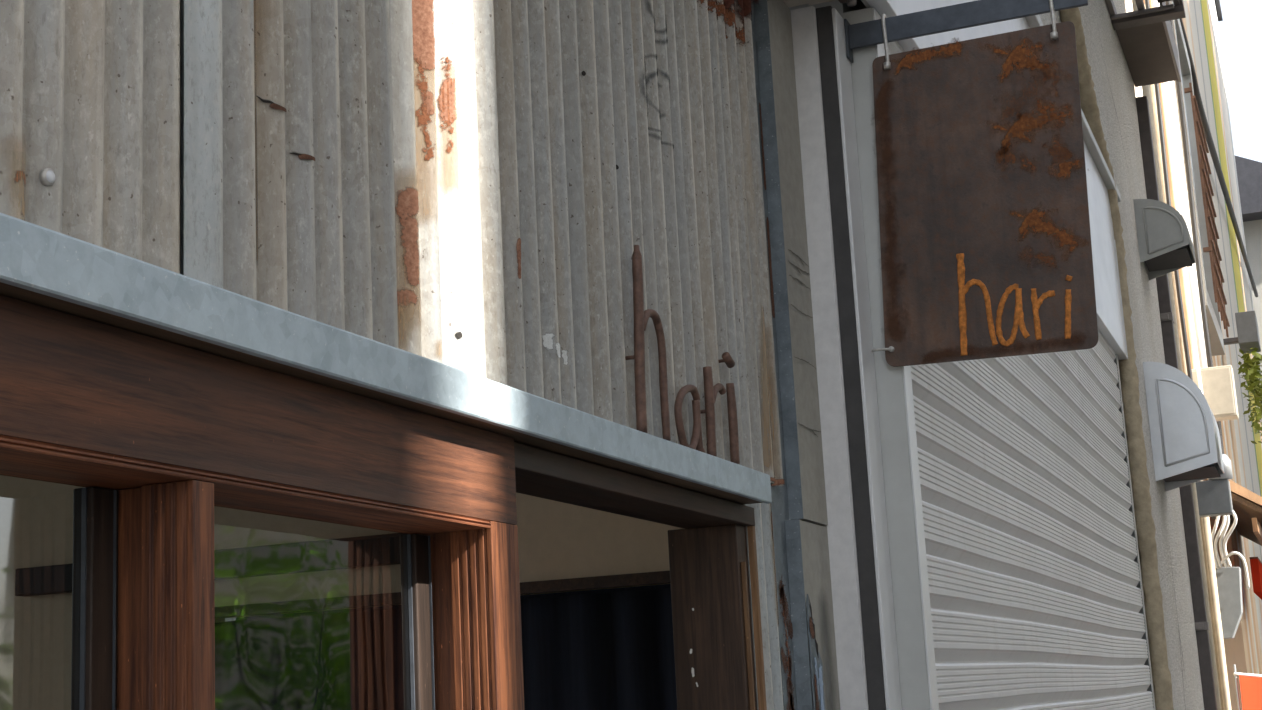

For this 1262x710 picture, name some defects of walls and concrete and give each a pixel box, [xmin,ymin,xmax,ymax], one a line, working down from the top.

rust [395,0,457,345]
rust [697,0,758,44]